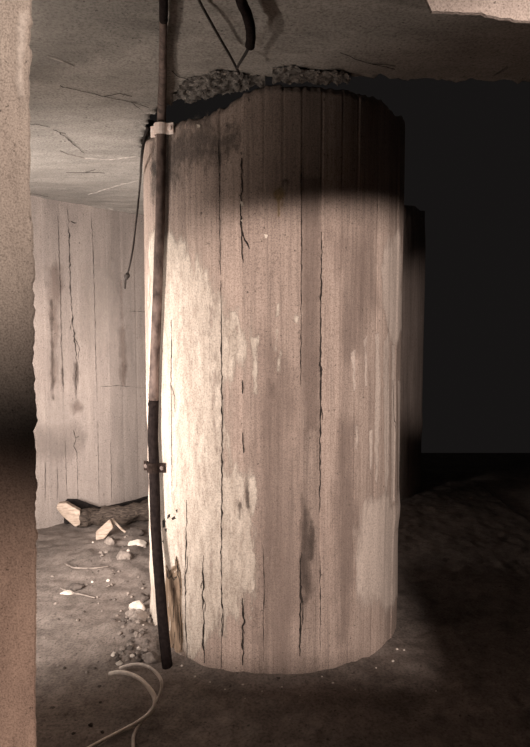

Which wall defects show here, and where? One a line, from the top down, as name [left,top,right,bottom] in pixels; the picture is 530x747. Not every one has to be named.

crack [60,85,149,109]
spalling [172,65,352,104]
crack [240,158,250,262]
crack [57,211,141,390]
crack [184,146,224,667]
crack [317,232,325,510]
crack [241,545,265,665]
water stain [301,513,314,591]
crack [299,553,321,652]